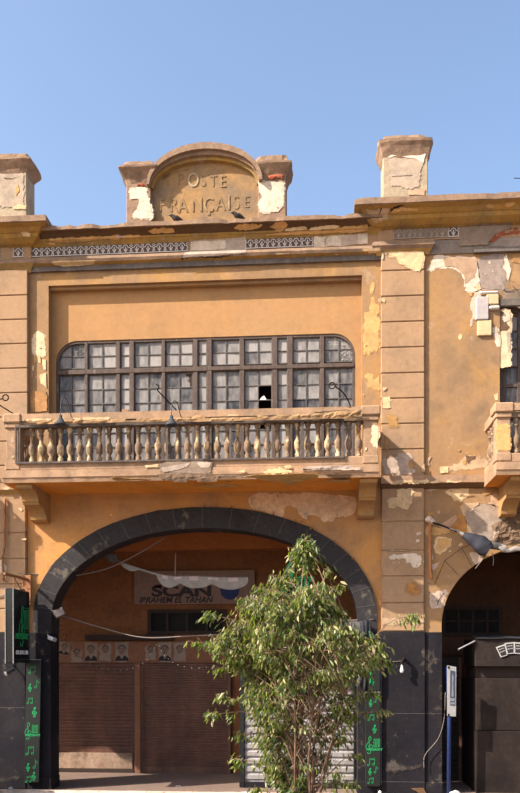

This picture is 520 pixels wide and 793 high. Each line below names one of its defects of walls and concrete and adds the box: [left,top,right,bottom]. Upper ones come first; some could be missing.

peeling [387,153,426,195]
peeling [49,183,175,245]
peeling [183,174,520,368]
spalling [24,331,362,424]
peeling [495,423,512,451]
peeling [111,461,361,522]
spalling [382,449,520,570]